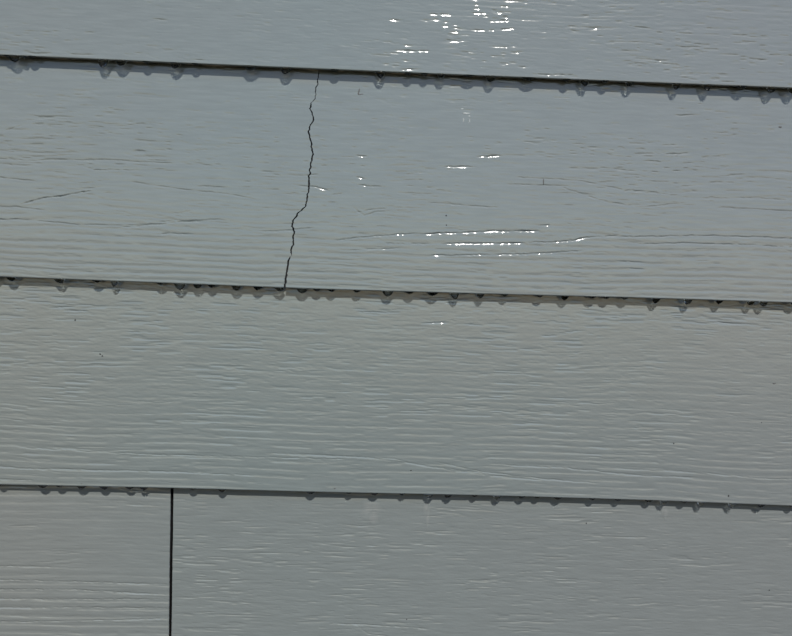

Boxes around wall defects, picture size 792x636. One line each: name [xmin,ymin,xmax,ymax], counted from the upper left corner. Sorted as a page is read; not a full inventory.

crack [284,72,319,287]